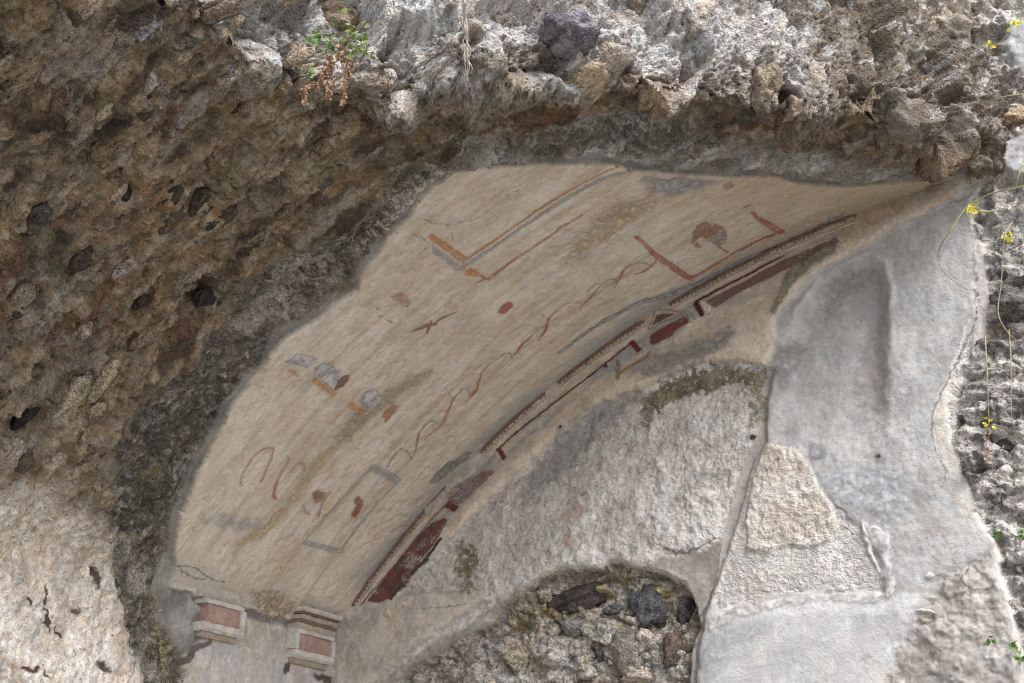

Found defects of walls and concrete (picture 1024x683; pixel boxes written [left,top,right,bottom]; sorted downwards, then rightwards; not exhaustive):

crack [931,289,978,479]
spalling [397,561,701,683]